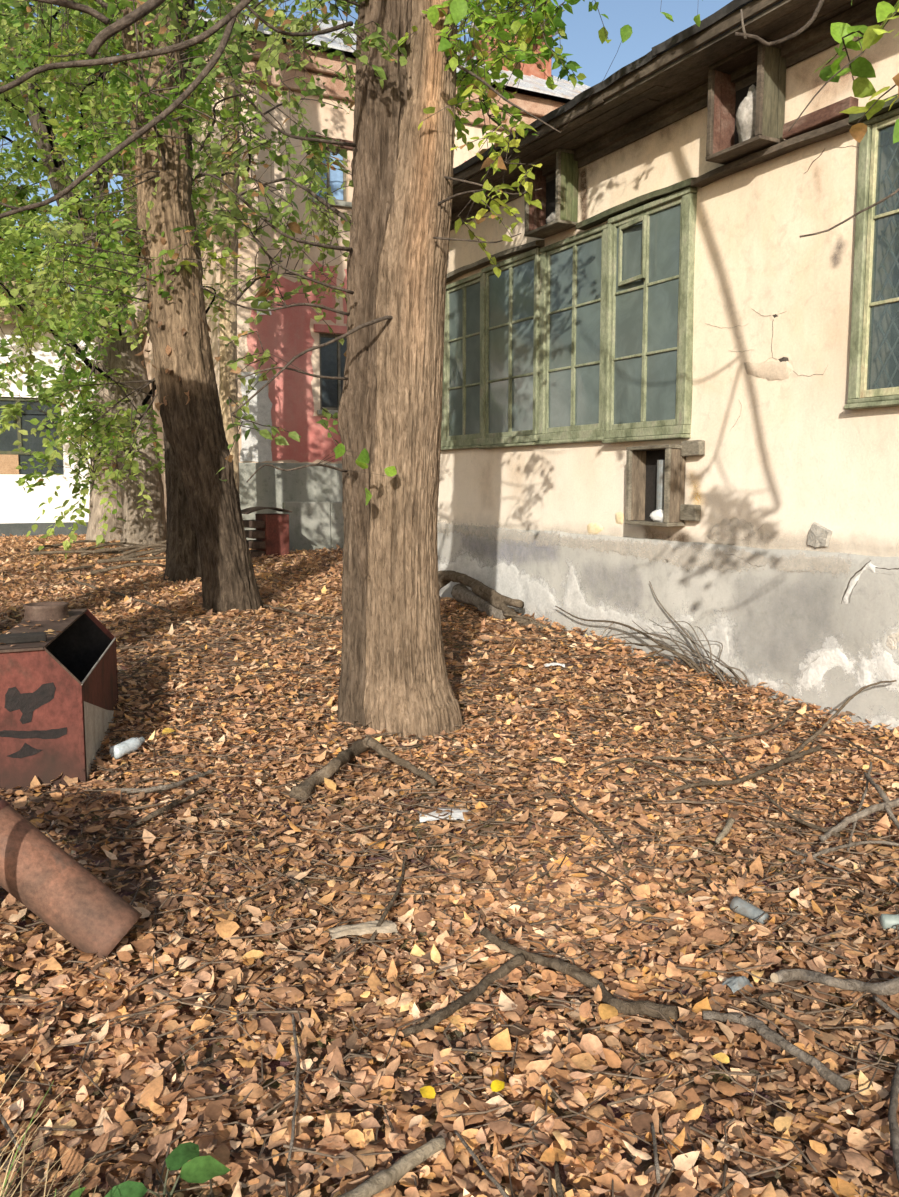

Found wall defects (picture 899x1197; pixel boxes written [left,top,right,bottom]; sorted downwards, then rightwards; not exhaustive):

crack [709,310,825,376]
spalling [776,354,794,374]
peeling [438,547,899,698]
peeling [854,708,899,737]